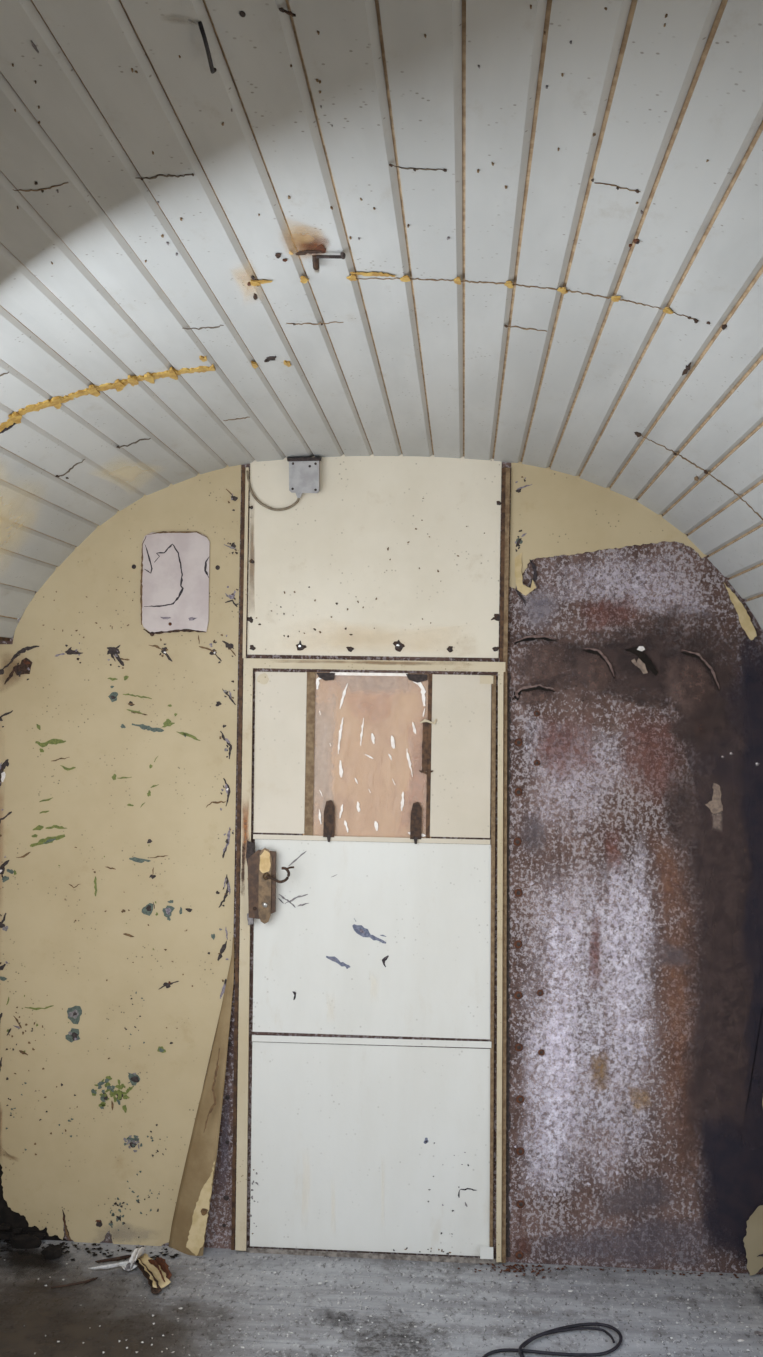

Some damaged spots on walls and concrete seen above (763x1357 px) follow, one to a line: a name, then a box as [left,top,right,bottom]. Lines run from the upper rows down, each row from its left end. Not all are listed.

crack [14,182,68,193]
crack [136,172,194,180]
corrosion [275,233,326,262]
crack [357,277,710,325]
crack [116,438,151,449]
crack [55,459,85,479]
peeling [0,646,39,684]
peeling [107,645,129,669]
peeling [198,634,256,663]
peeling [0,759,9,786]
peeling [491,530,763,1276]
corrosion [593,1059,606,1084]